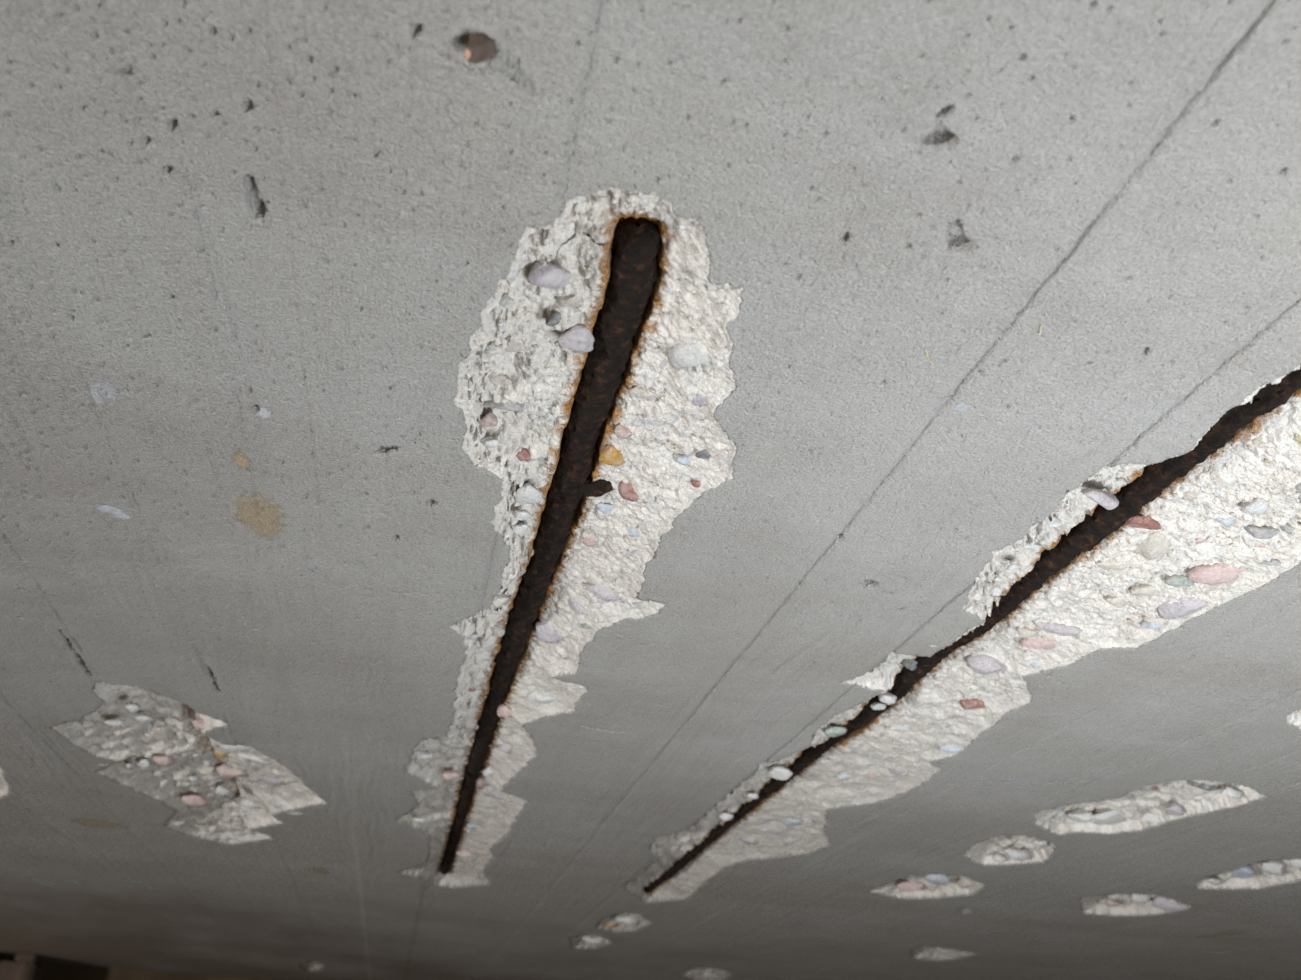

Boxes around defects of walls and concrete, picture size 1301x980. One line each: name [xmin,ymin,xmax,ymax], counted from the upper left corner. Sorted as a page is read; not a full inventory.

spalling [0,768,10,798]
spalling [51,682,327,844]
rust [440,217,661,875]
spalling [396,186,743,887]
spalling [571,364,1301,948]
spalling [911,946,973,961]
rust [643,367,1301,893]